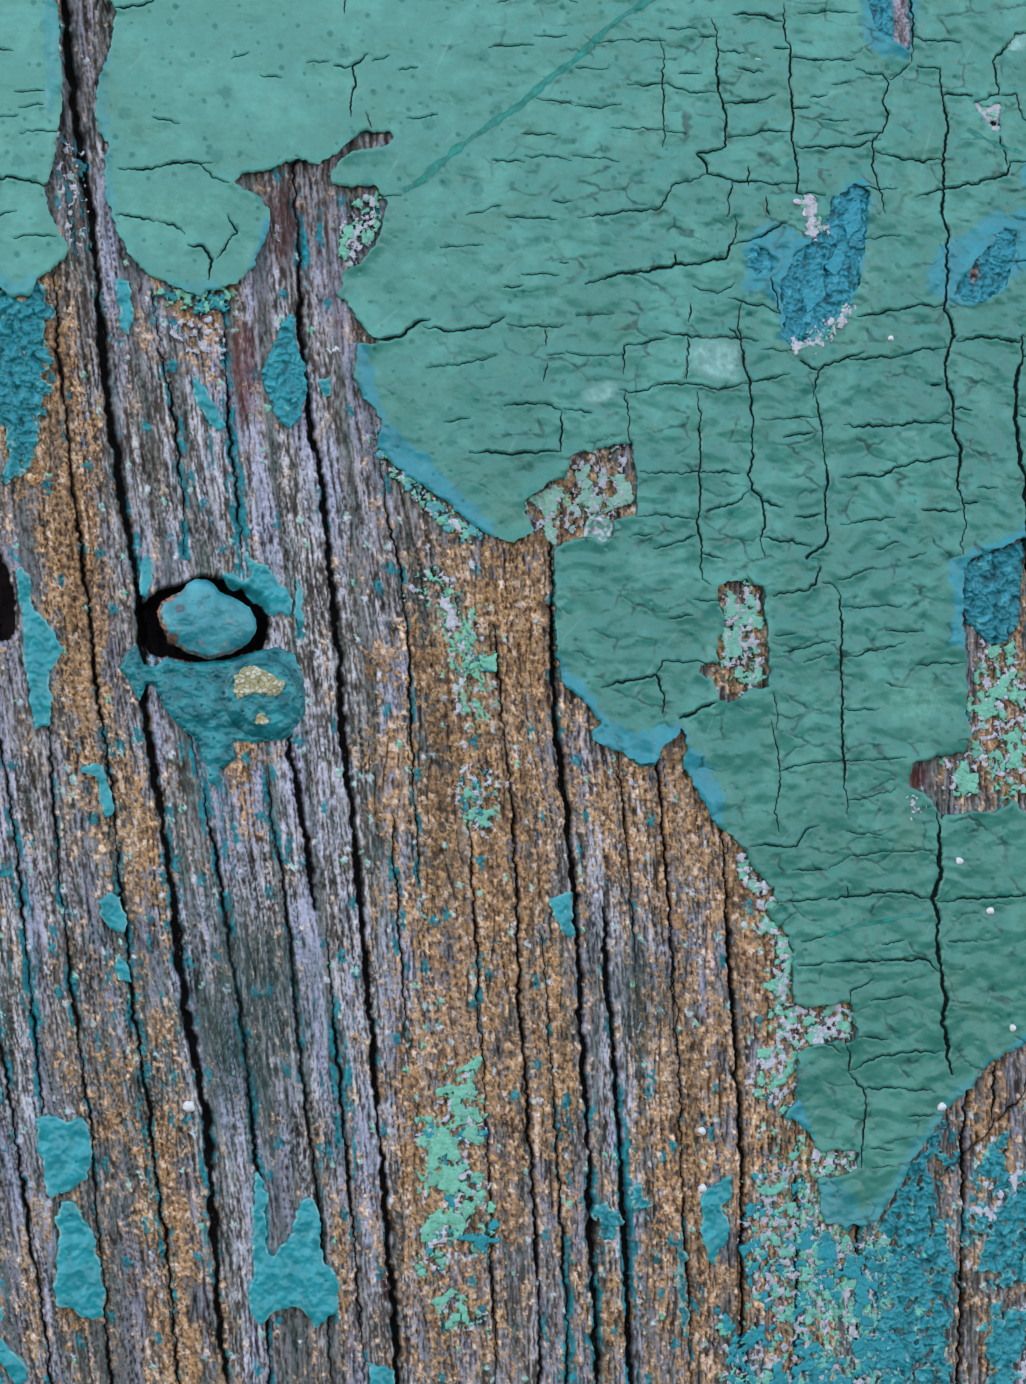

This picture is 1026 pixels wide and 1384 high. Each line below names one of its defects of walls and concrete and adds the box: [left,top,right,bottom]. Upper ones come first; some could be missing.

crack [231,52,417,128]
crack [222,313,243,566]
crack [0,0,238,1384]
crack [268,161,420,1384]
crack [379,0,1026,1384]
peeling [936,638,1026,810]
crack [190,735,260,1175]
peeling [735,844,855,1114]
peeling [35,1114,106,1319]
peeling [247,1171,340,1328]
peeling [414,1056,500,1277]
peeling [699,1144,911,1384]